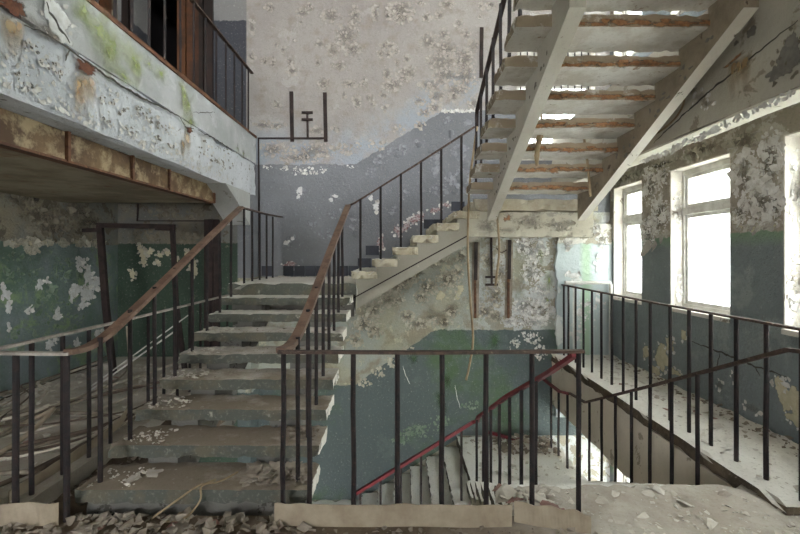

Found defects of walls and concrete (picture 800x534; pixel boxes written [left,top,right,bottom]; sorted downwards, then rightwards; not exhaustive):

spalling [40,0,76,47]
rust [579,19,710,27]
rust [548,93,655,101]
rust [561,60,681,68]
crack [658,20,798,139]
peeling [259,0,480,252]
rust [526,145,618,153]
peeling [608,27,800,257]
spalling [0,235,107,351]
peeling [475,215,578,361]
crack [692,341,786,377]
spalling [770,375,799,431]